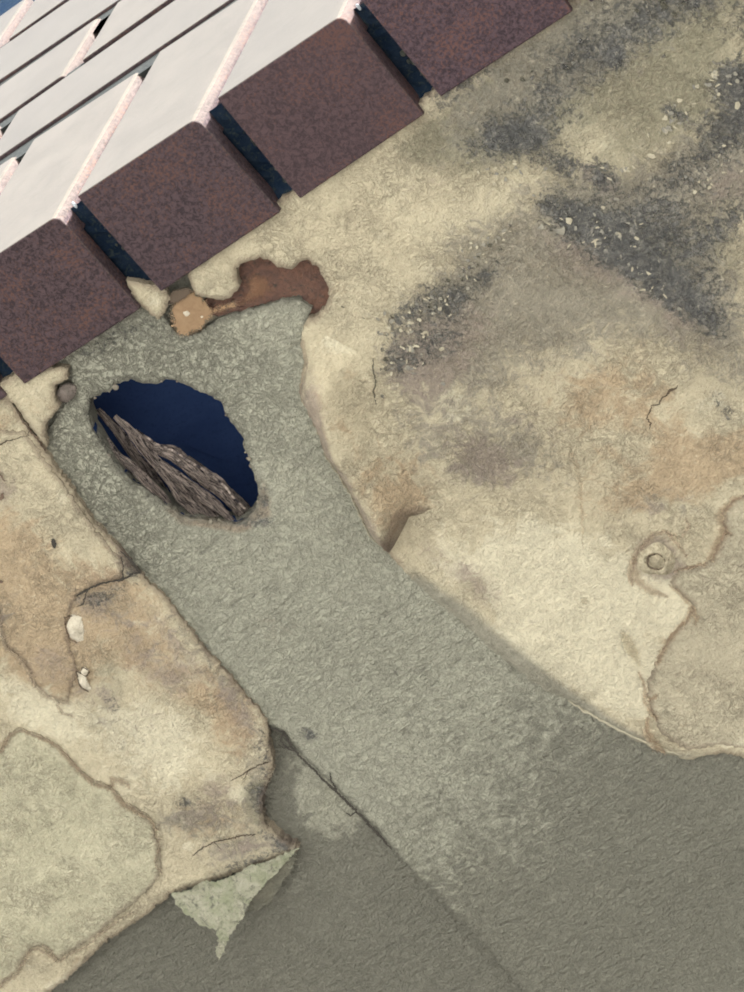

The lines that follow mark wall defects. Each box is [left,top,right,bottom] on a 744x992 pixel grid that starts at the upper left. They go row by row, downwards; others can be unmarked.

peeling [538,197,643,253]
corrosion [168,278,268,336]
peeling [376,228,512,387]
spalling [47,257,744,992]
crack [192,834,256,856]